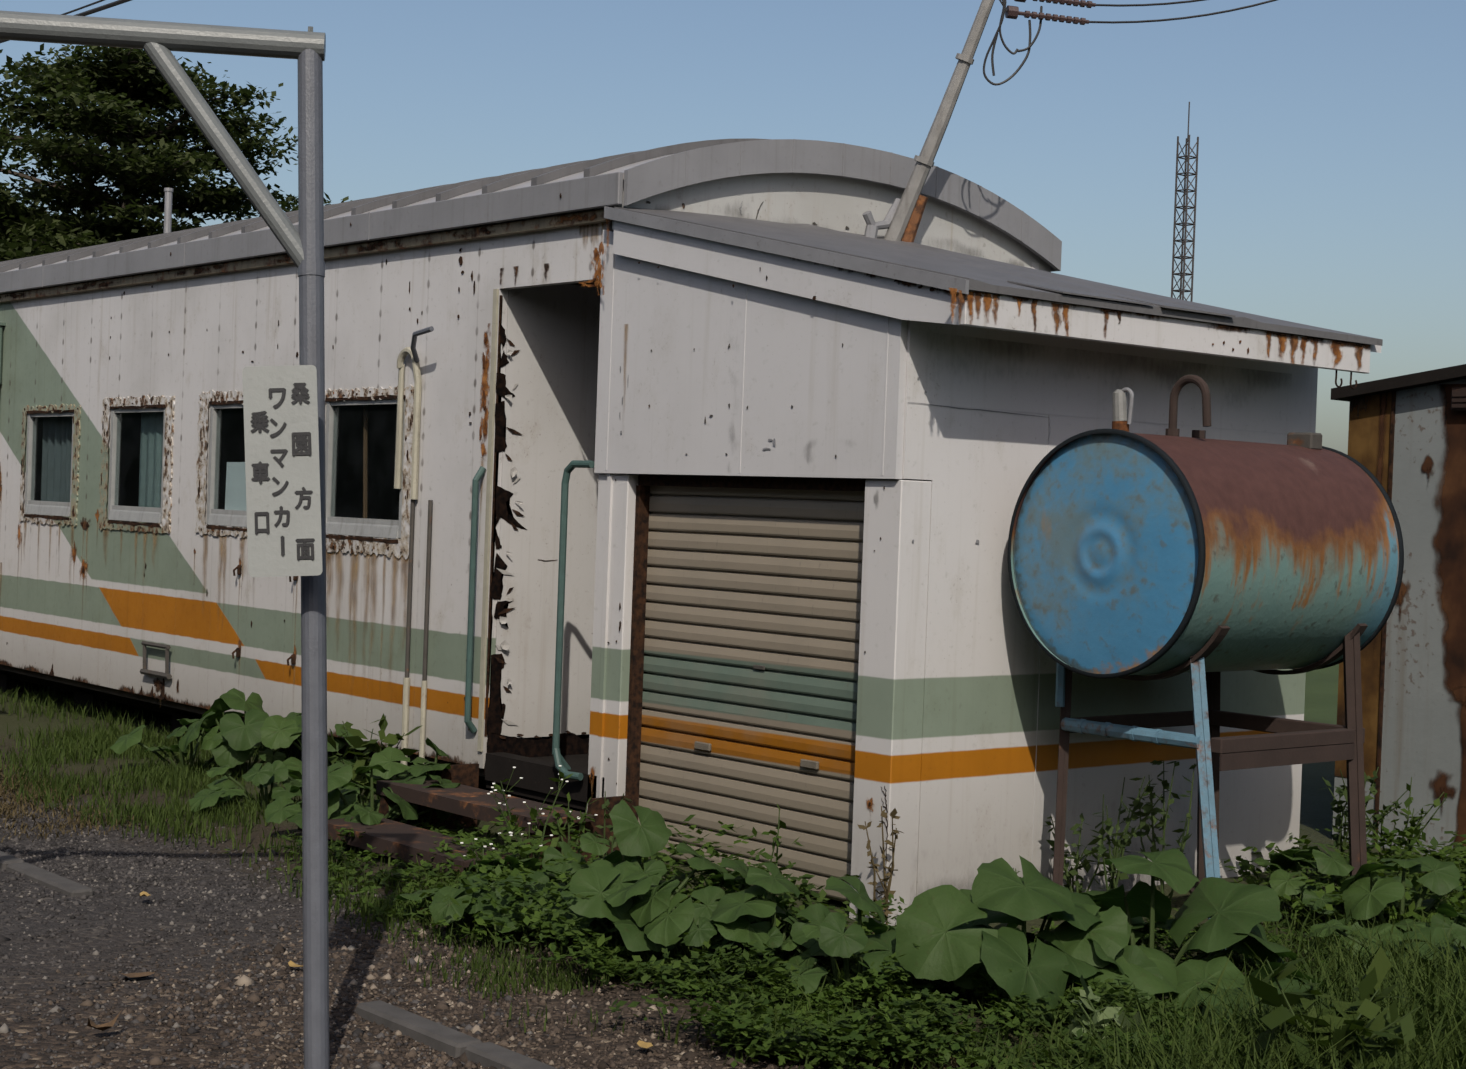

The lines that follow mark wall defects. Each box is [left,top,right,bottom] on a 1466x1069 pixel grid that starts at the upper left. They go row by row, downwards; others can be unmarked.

rust [551,211,609,295]
rust [949,288,1077,335]
rust [1100,308,1164,337]
rust [1213,324,1371,369]
peeling [18,404,81,527]
peeling [98,395,175,535]
peeling [195,390,247,538]
peeling [325,384,414,560]
rust [1348,392,1392,494]
rust [17,509,155,581]
rust [1421,384,1466,849]
rust [1335,629,1382,782]